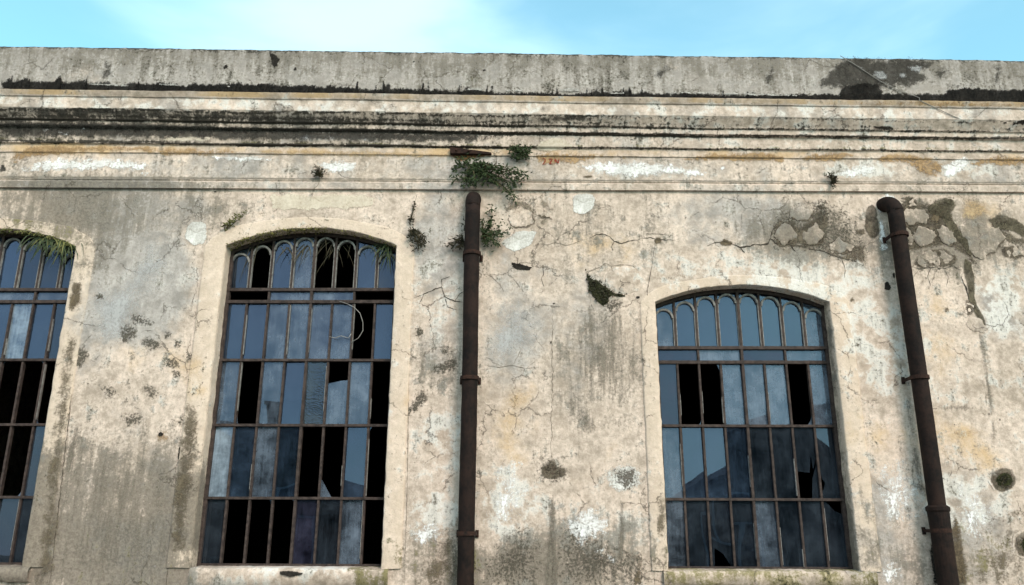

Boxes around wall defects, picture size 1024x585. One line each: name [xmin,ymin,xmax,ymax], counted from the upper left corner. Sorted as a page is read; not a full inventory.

leakage [1,57,1024,108]
crack [417,277,462,310]
crack [541,225,676,295]
flaking render [770,199,868,265]
flaking render [901,196,1024,268]
leakage [929,198,1024,326]
flaking render [537,460,567,482]
leakage [483,461,542,585]
leakage [558,509,647,585]
rust [952,519,968,585]